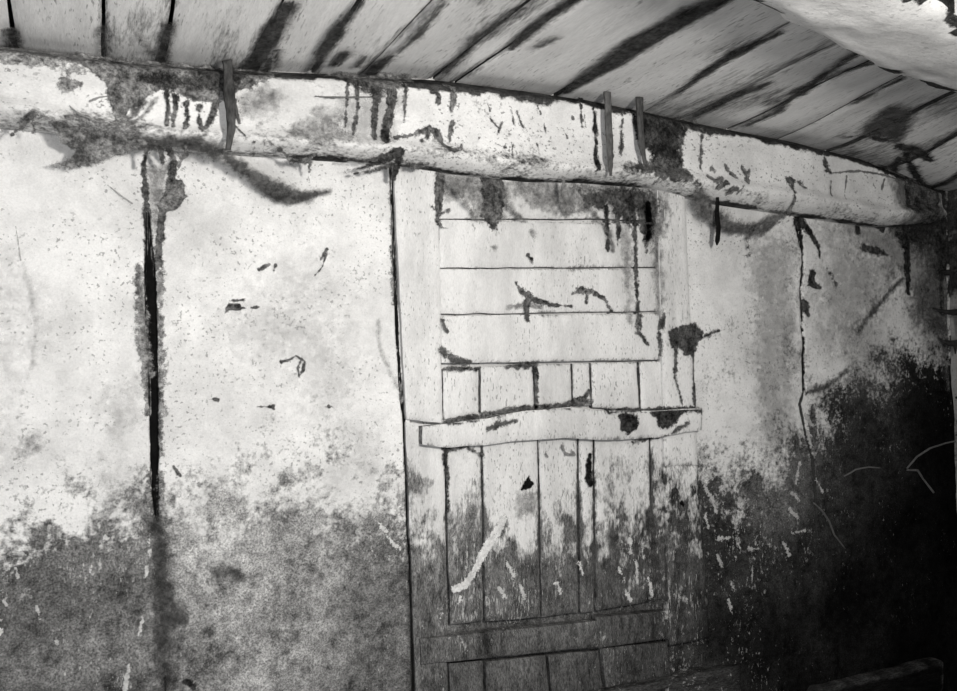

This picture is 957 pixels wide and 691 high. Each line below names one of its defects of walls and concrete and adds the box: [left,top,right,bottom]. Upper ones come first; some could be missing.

damp [235,88,279,136]
damp [290,120,343,141]
damp [853,77,905,104]
damp [842,106,957,389]
crack [855,227,911,334]
crack [794,217,848,538]
crack [110,160,187,691]
damp [214,567,250,582]
damp [166,604,187,625]